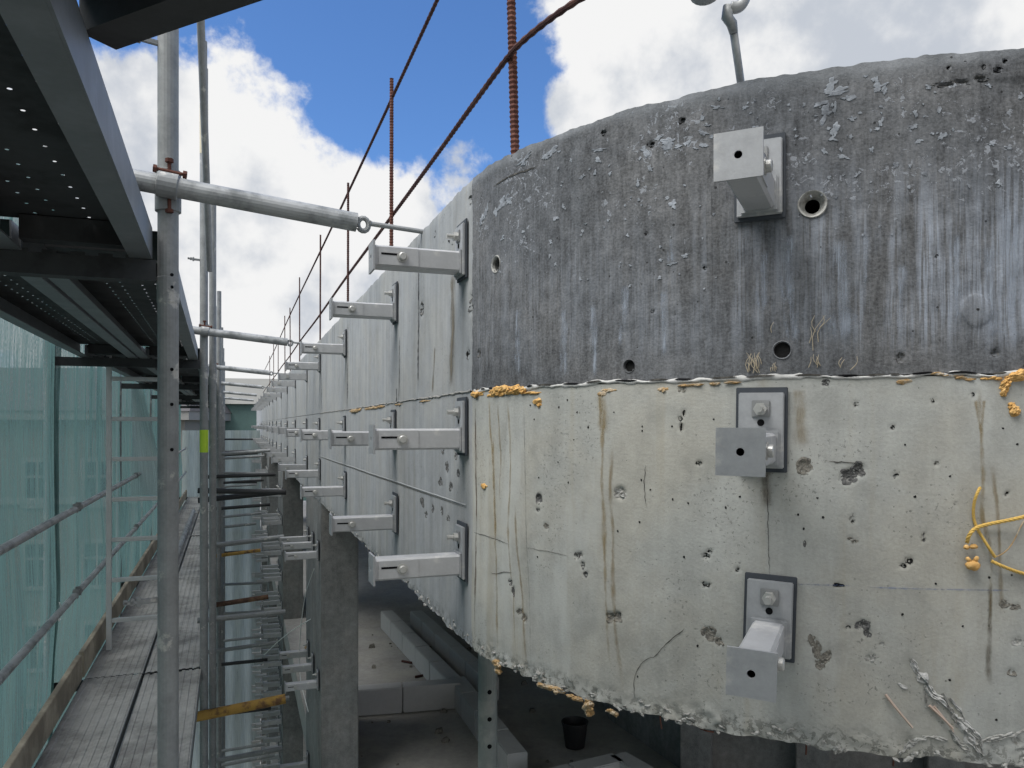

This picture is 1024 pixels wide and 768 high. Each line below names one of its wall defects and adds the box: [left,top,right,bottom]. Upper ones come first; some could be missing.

peeling [786,77,862,159]
peeling [863,75,888,133]
peeling [902,103,955,144]
peeling [925,59,1008,93]
peeling [624,97,729,220]
crack [764,480,772,574]
spalling [508,579,527,622]
spalling [606,612,622,623]
crack [633,628,685,697]
spalling [700,626,724,646]
spalling [613,699,696,727]
peeling [893,658,1024,768]